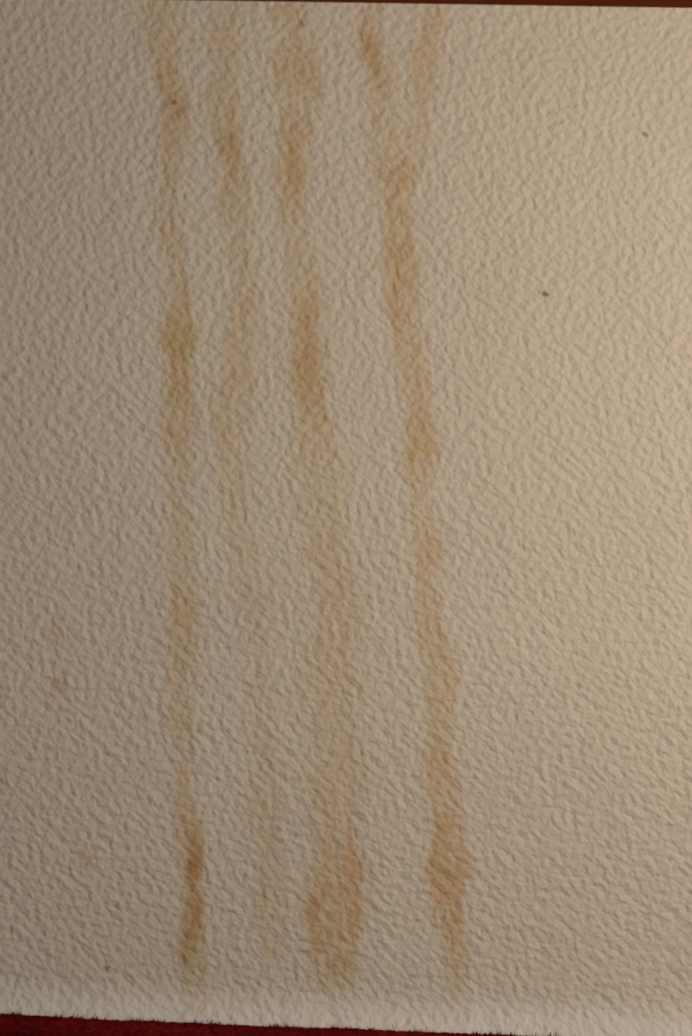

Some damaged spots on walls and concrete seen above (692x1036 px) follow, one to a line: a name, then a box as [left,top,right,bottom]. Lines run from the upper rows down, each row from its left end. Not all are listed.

leakage [131,1,386,1021]
leakage [348,4,481,1005]